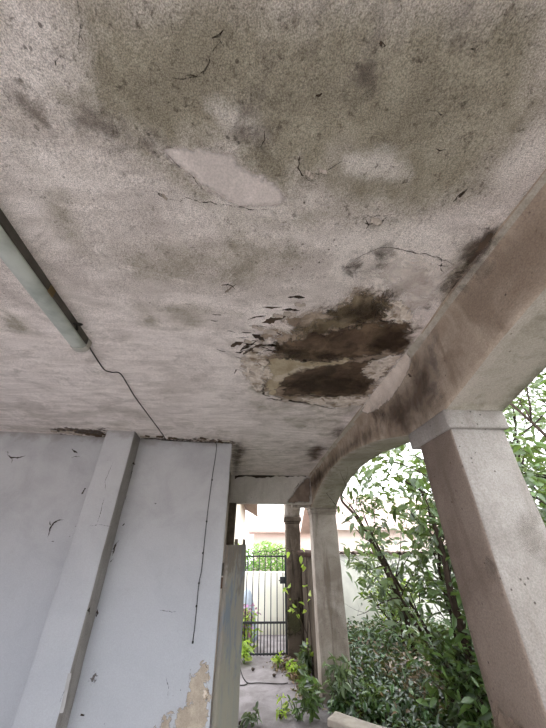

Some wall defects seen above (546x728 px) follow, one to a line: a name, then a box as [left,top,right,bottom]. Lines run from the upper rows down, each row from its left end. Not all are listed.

crack [172,30,223,80]
damp [456,228,497,277]
spalling [217,282,419,414]
peeling [154,660,212,728]